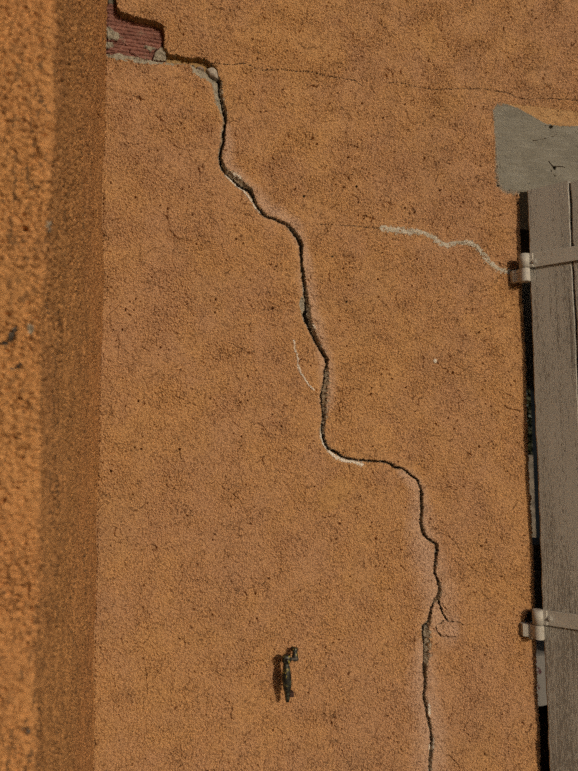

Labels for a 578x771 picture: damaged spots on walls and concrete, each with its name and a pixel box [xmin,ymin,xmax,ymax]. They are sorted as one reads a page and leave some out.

spalling [106,0,221,114]
crack [211,62,469,771]